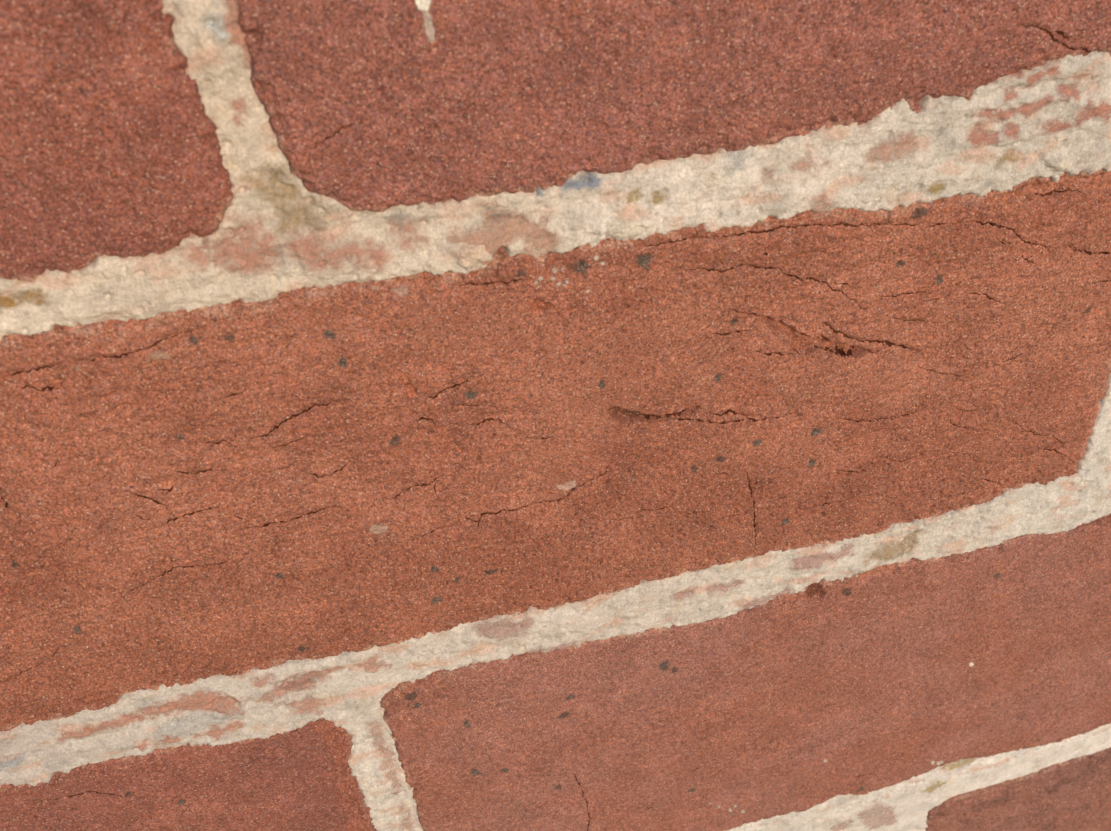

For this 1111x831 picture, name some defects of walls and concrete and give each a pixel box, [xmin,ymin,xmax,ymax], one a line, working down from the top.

crack [1026,189,1084,198]
crack [452,279,521,287]
crack [643,220,1110,379]
crack [634,406,803,424]
crack [836,401,1008,486]
crack [1015,423,1074,463]